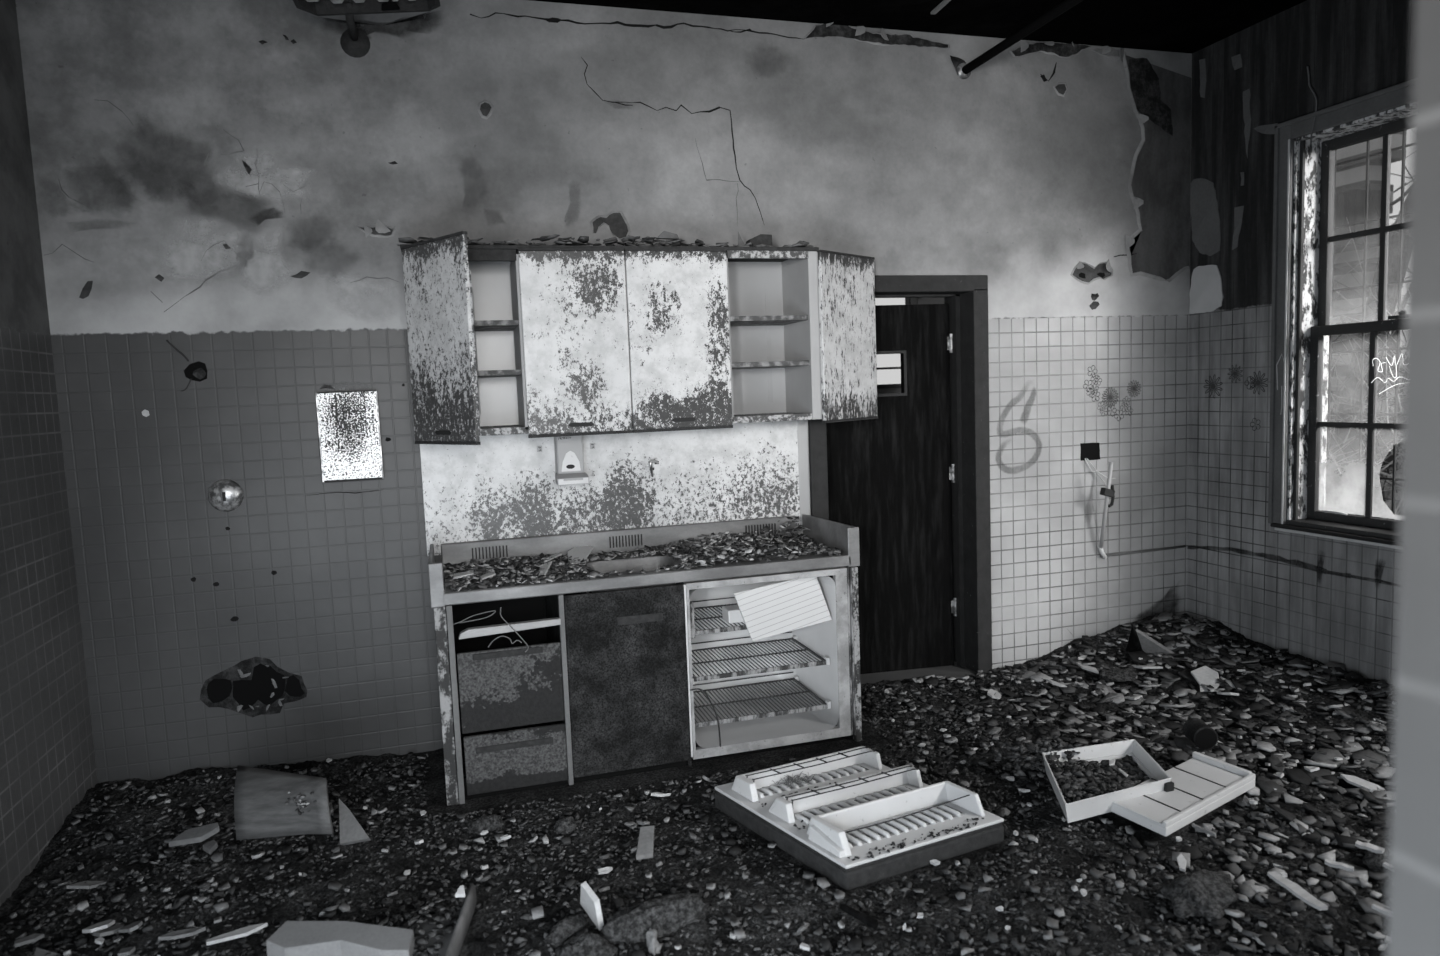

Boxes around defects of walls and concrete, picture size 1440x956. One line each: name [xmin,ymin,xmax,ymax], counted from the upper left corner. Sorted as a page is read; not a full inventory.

flaking render [803,22,966,68]
damp [168,156,303,288]
crack [470,12,816,223]
flaking render [1009,41,1244,314]
peeling [1240,88,1278,186]
hole [200,657,307,717]